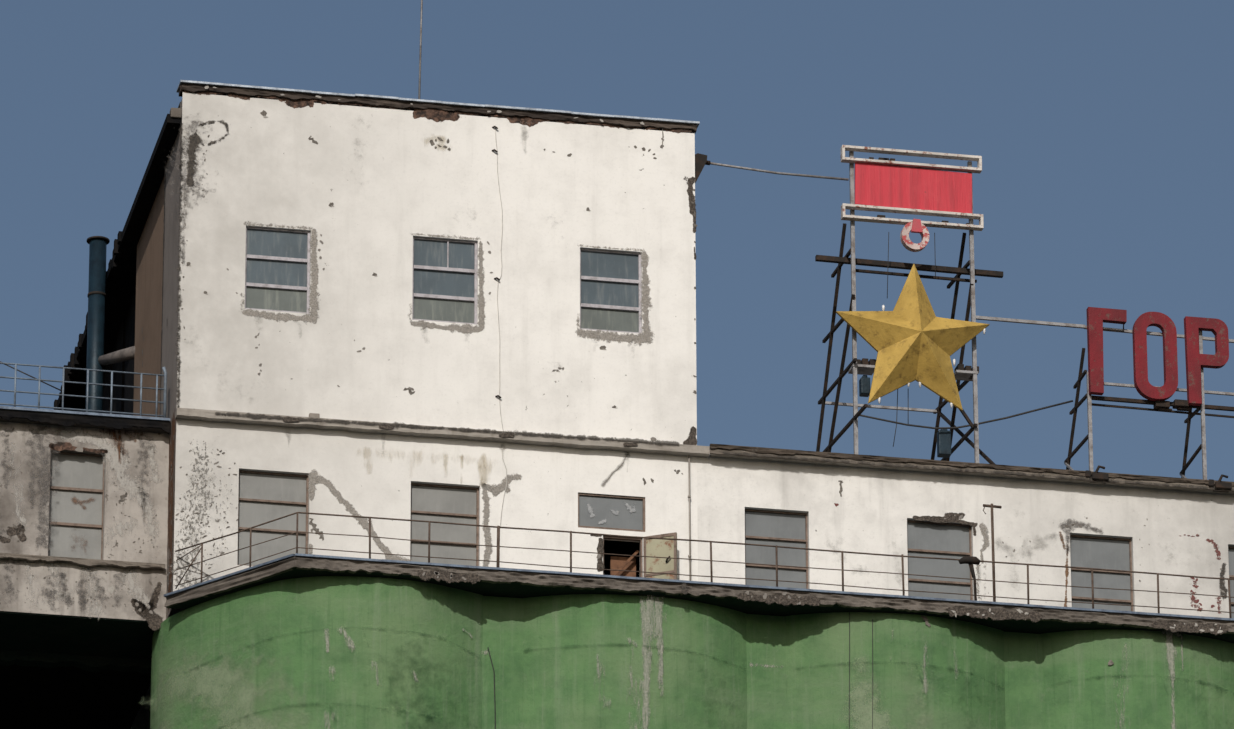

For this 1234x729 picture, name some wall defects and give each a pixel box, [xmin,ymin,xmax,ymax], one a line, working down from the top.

spalling [180,86,693,159]
water stain [26,426,57,549]
water stain [0,562,130,609]
peeling [47,430,238,631]
spalling [737,591,820,606]
water stain [630,595,663,729]